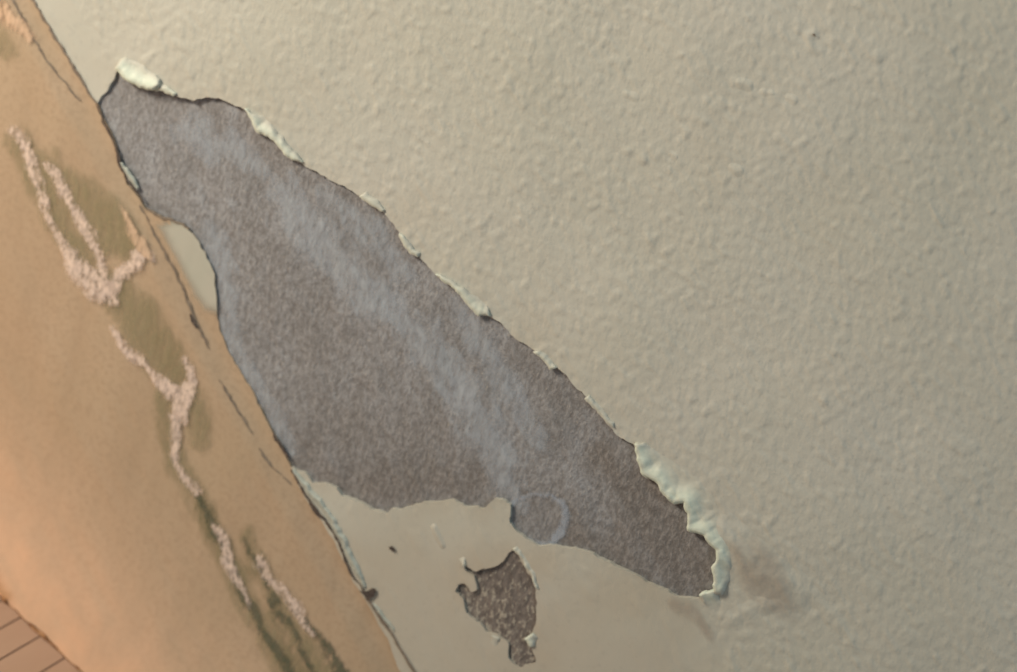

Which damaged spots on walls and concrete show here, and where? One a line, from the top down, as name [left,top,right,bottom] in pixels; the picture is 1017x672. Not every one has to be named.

damp [9,126,154,305]
damp [109,327,349,672]
peeling [96,58,732,610]
peeling [457,546,539,667]